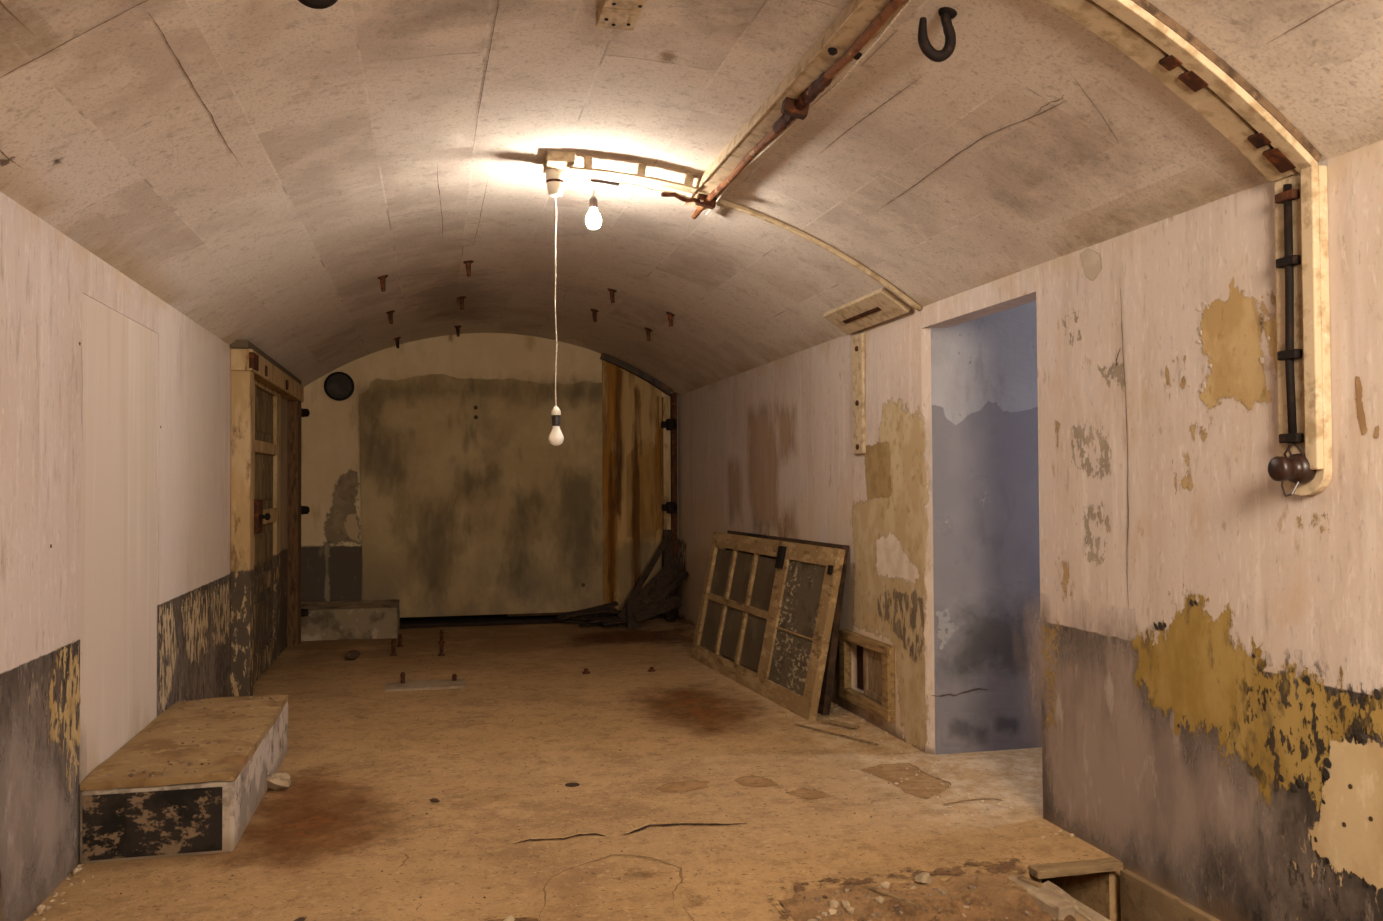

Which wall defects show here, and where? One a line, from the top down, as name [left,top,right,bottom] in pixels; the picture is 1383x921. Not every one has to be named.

crack [877,70,1118,211]
peeling [1165,277,1277,494]
peeling [850,398,955,750]
peeling [1058,557,1072,602]
peeling [1083,502,1111,566]
peeling [0,639,82,921]
peeling [158,581,230,711]
corrosion [226,774,373,864]
crack [512,814,747,921]
corrosion [640,689,746,732]
peeling [1030,584,1383,893]